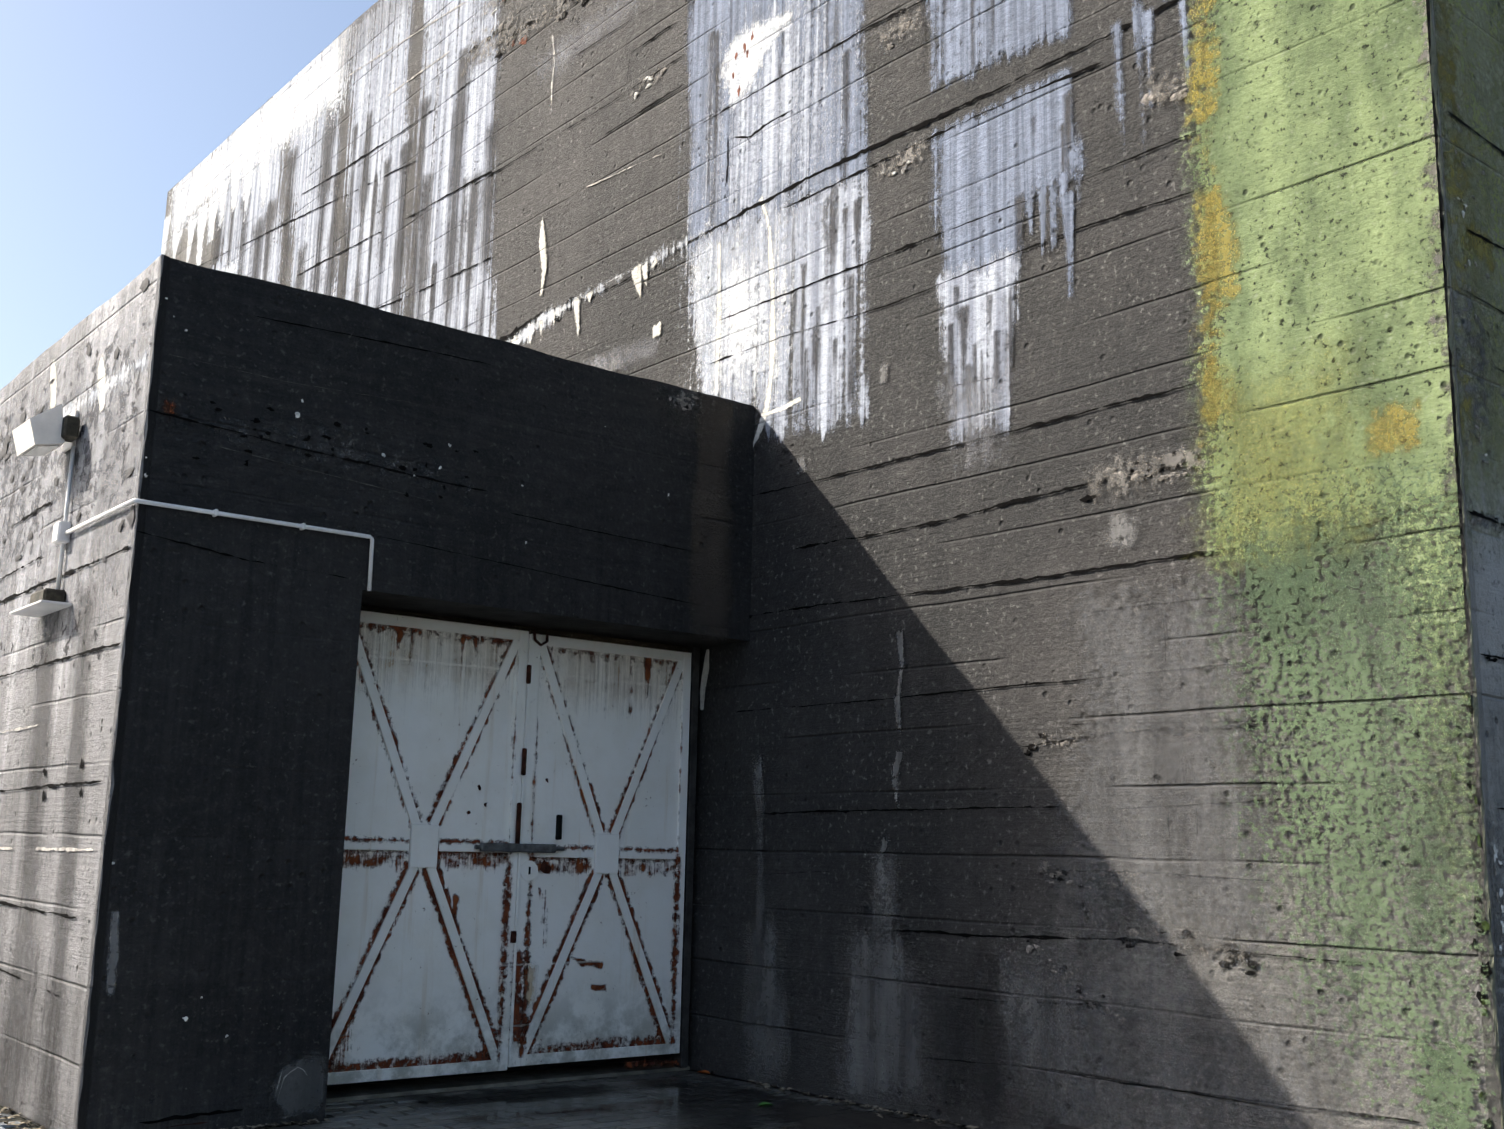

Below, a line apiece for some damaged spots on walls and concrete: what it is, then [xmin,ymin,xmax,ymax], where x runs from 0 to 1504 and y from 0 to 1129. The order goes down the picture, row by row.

spalling [458,0,591,83]
water stain [920,0,1073,91]
water stain [1112,0,1153,121]
crack [1448,111,1504,155]
water stain [161,0,871,443]
water stain [931,69,1083,444]
rust [658,394,733,640]
crack [737,674,1127,712]
crack [749,508,1504,671]
crack [1022,720,1299,747]
water stain [1058,375,1480,949]
rust [328,623,682,1073]